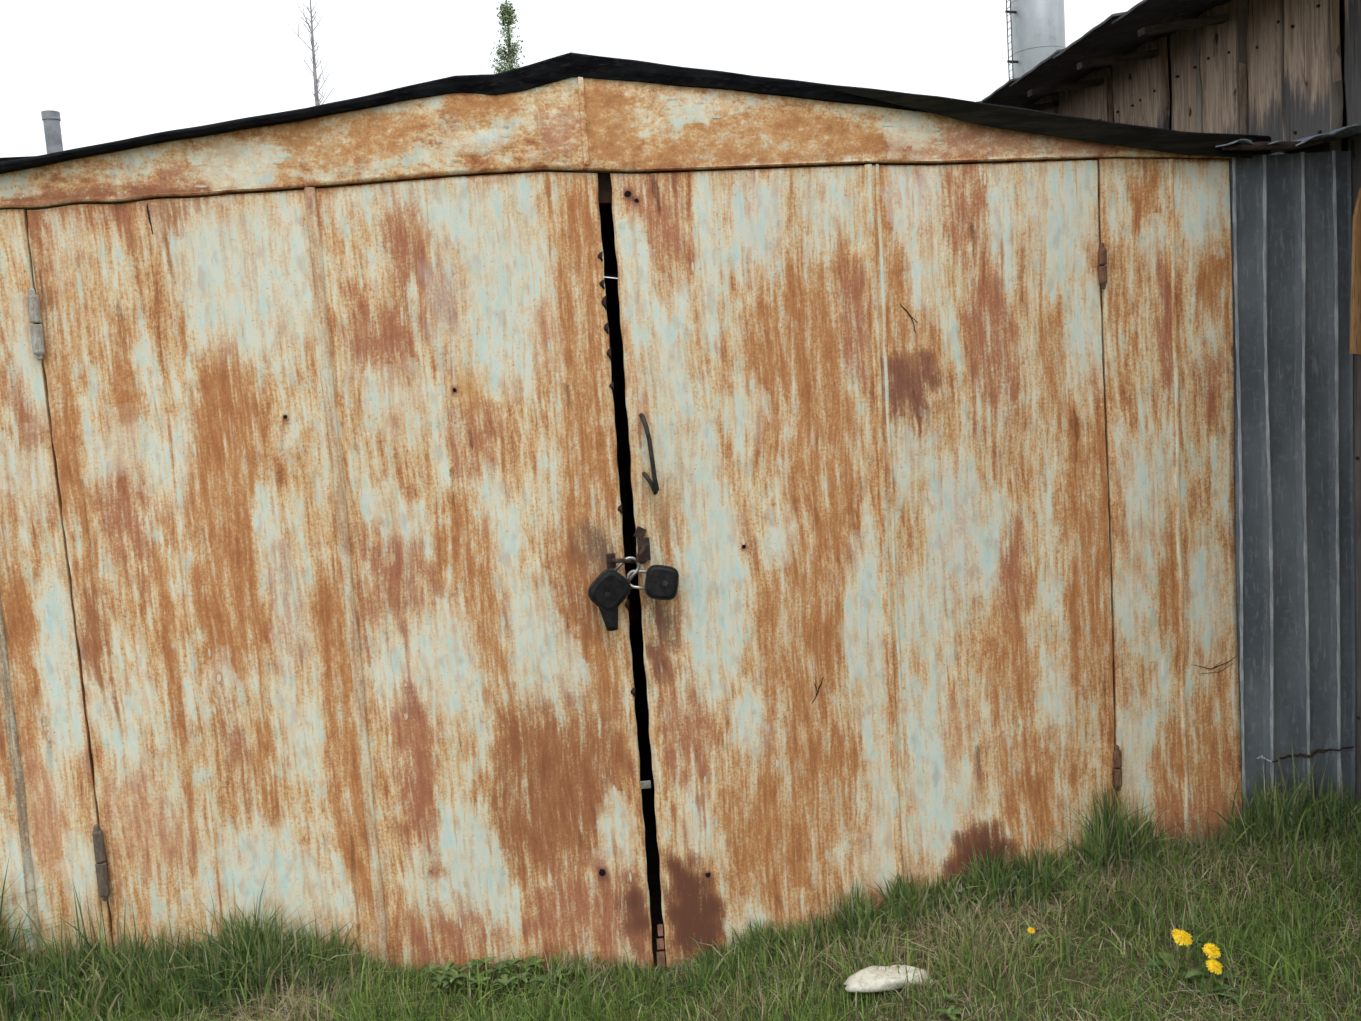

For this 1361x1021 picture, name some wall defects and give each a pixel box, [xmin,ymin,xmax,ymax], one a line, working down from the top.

rust [0,77,1233,973]